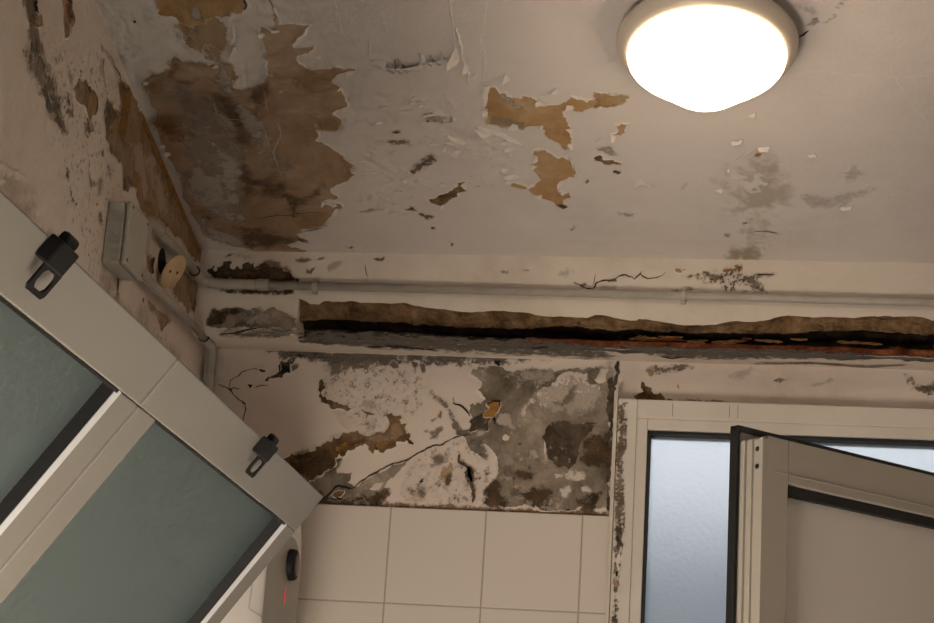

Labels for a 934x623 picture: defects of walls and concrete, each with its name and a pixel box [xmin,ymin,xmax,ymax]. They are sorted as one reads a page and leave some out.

peeling [22,0,43,30]
peeling [59,0,75,40]
damp [23,23,86,135]
damp [66,45,201,262]
peeling [142,0,357,252]
peeling [481,83,630,209]
peeling [426,181,470,210]
damp [173,273,198,313]
damp [207,254,324,281]
crack [574,271,661,289]
crack [218,368,266,420]
spalling [205,289,934,513]